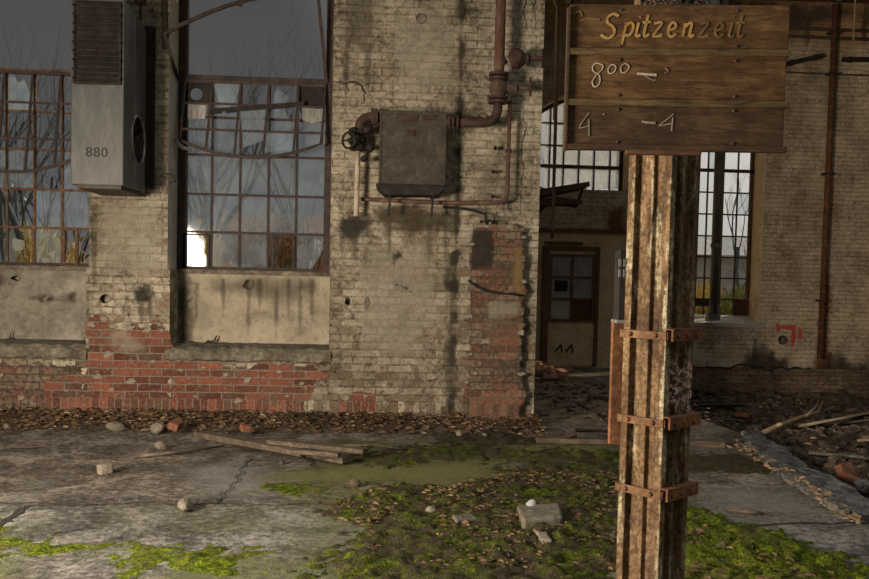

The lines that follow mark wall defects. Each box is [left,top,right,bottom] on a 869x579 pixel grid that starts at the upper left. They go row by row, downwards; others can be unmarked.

spalling [0,314,329,415]
water stain [179,283,192,341]
peeling [462,222,527,421]